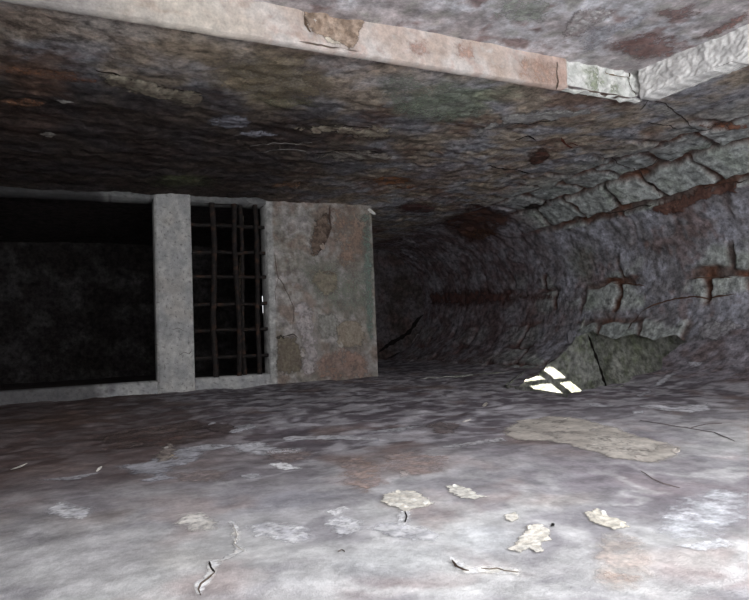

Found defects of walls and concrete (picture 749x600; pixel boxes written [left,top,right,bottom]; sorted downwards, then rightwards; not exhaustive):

spalling [304,12,364,49]
crack [590,157,674,216]
spalling [310,207,332,256]
crack [628,276,733,329]
crack [379,314,424,360]
crack [588,335,607,386]
peeling [506,416,680,462]
spalling [381,490,434,526]
crack [195,521,244,595]
spalling [508,523,555,552]